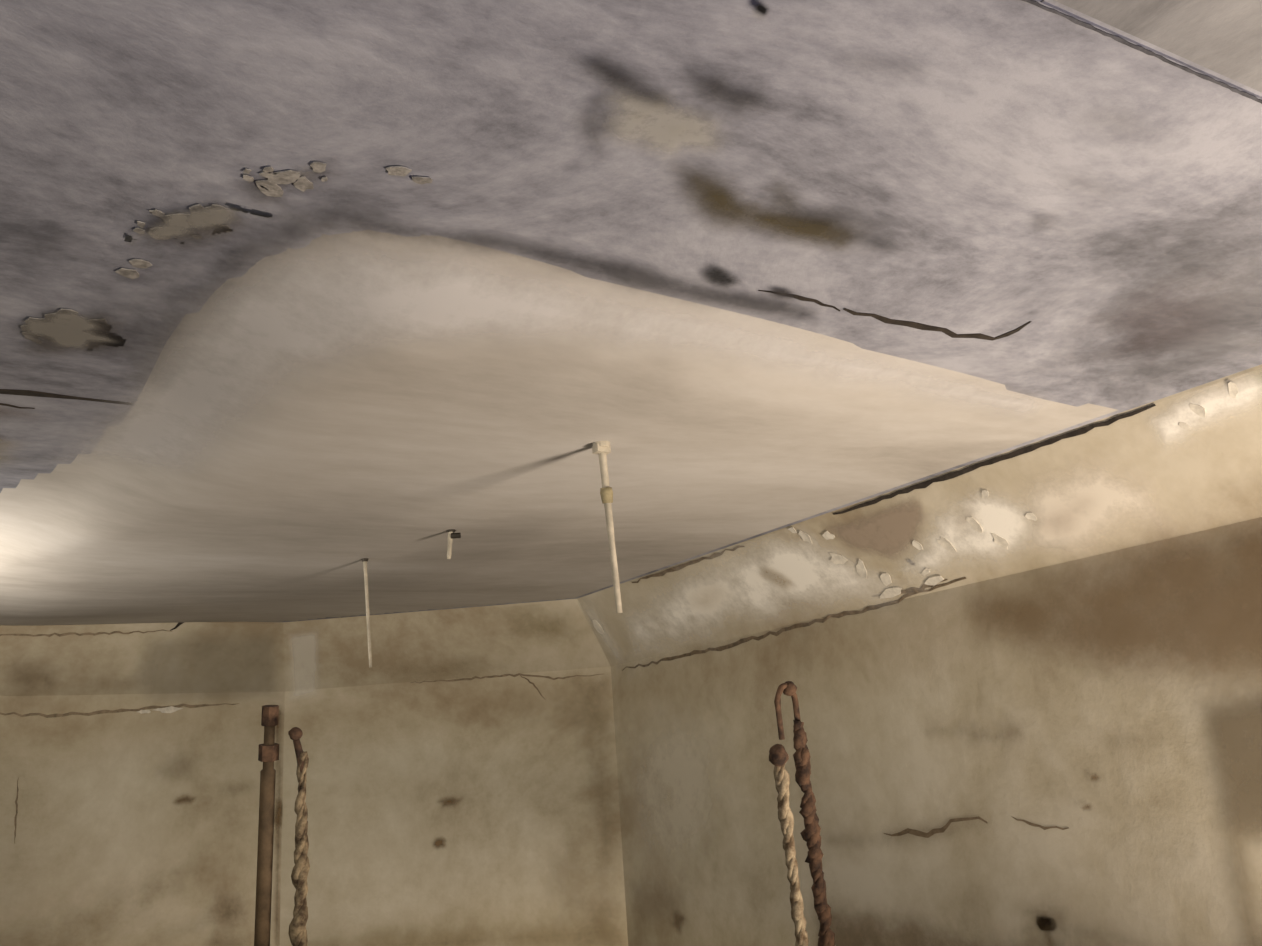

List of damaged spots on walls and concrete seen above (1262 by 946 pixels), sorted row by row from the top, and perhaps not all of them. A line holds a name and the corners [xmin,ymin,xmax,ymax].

spalling [243,161,327,197]
spalling [133,204,234,240]
spalling [21,309,109,351]
crack [758,290,1032,341]
crack [0,389,133,409]
peeling [632,472,1156,644]
crack [410,575,967,699]
crack [0,703,239,718]
crack [884,816,1069,838]